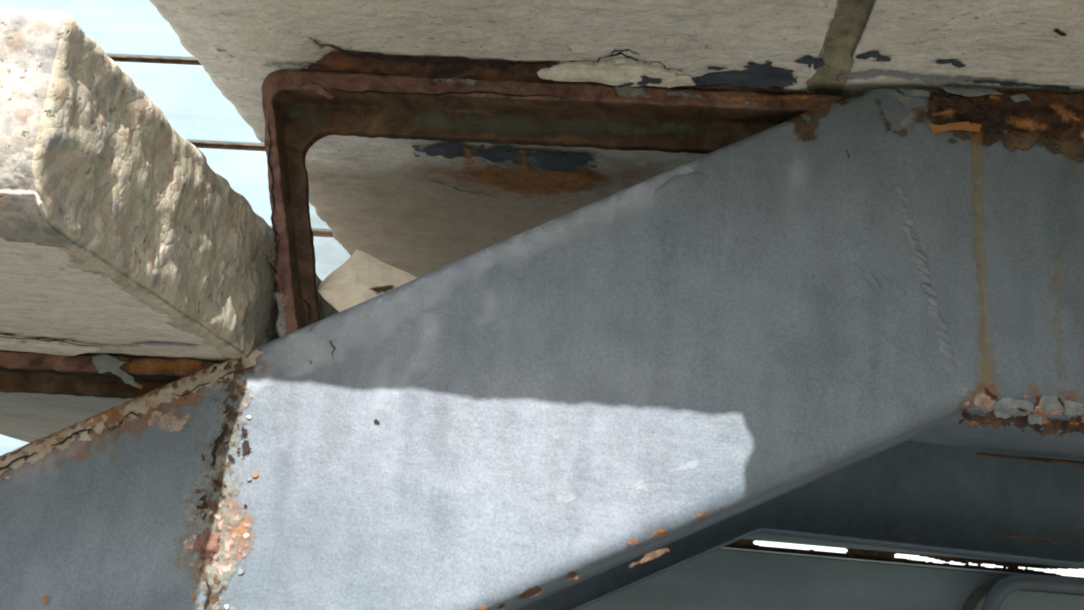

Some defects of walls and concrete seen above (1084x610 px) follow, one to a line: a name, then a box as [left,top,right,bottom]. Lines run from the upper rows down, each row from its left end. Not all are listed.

spalling [300,51,567,83]
spalling [651,75,815,95]
rust [714,88,915,141]
rust [412,143,607,196]
rust [371,285,396,294]
peeling [959,386,1084,438]
rust [0,357,258,610]